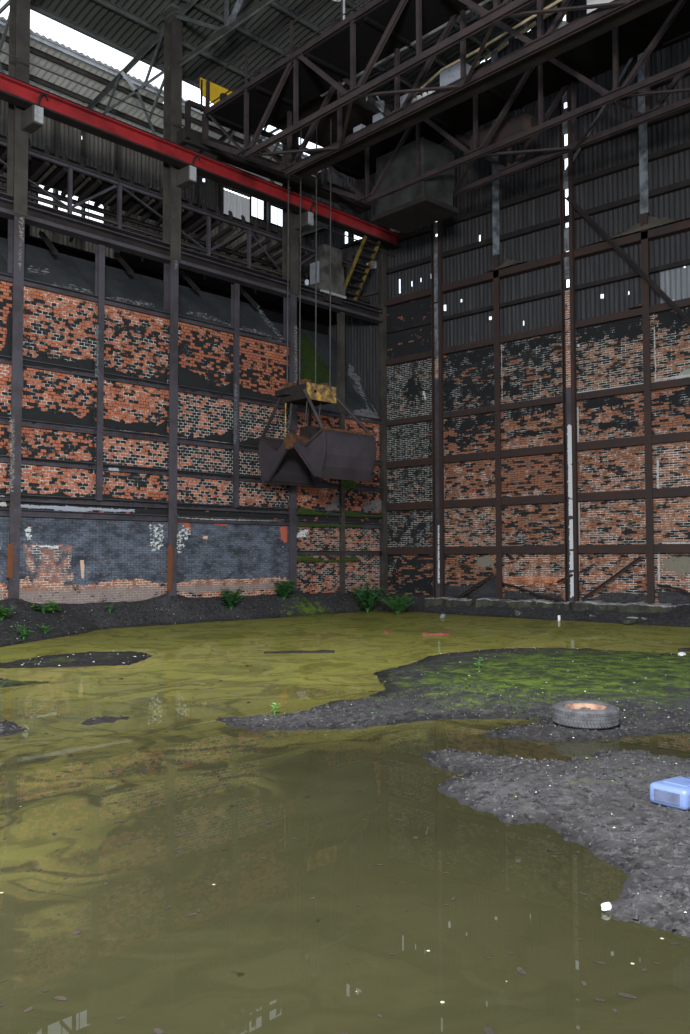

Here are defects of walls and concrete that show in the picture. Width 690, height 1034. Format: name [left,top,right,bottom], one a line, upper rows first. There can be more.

peeling [280,527,309,543]
spalling [0,527,161,604]
spalling [177,576,287,593]